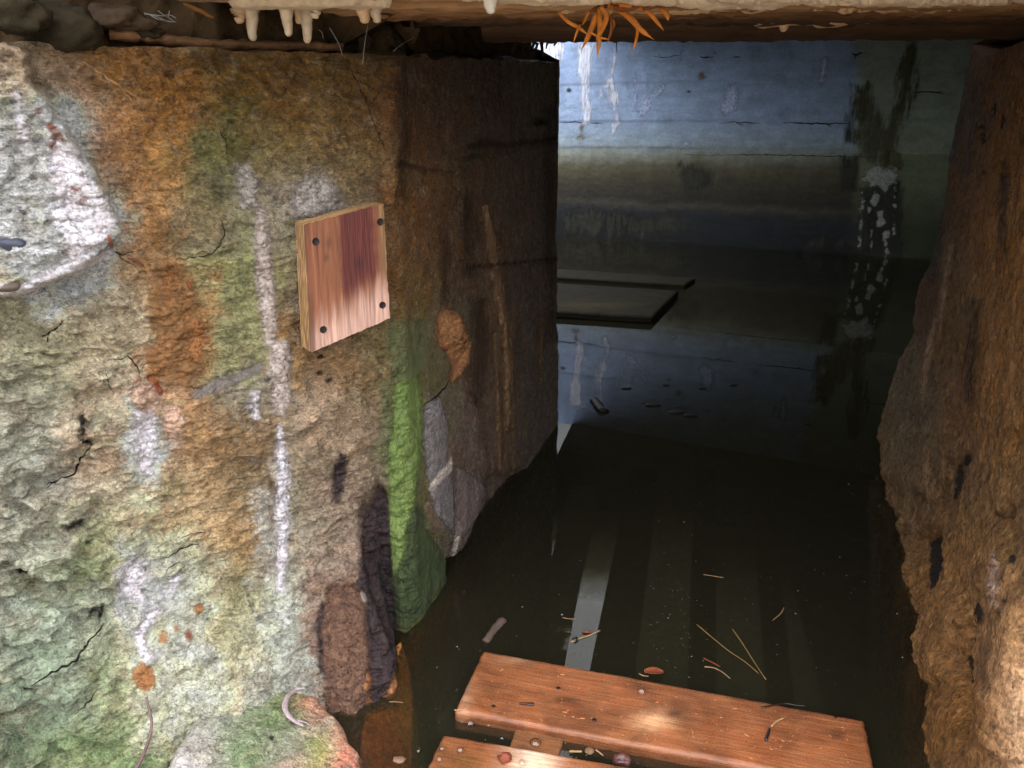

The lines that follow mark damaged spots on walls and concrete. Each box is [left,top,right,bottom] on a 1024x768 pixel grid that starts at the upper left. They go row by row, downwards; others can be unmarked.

water stain [535,42,564,63]
water stain [578,43,620,134]
water stain [289,175,343,219]
crack [177,220,225,260]
corrosion [146,206,209,396]
water stain [235,163,293,593]
water stain [133,376,187,476]
crack [44,444,93,490]
water stain [331,452,347,504]
water stain [357,485,451,709]
crack [35,623,104,684]
corrosion [132,663,155,691]